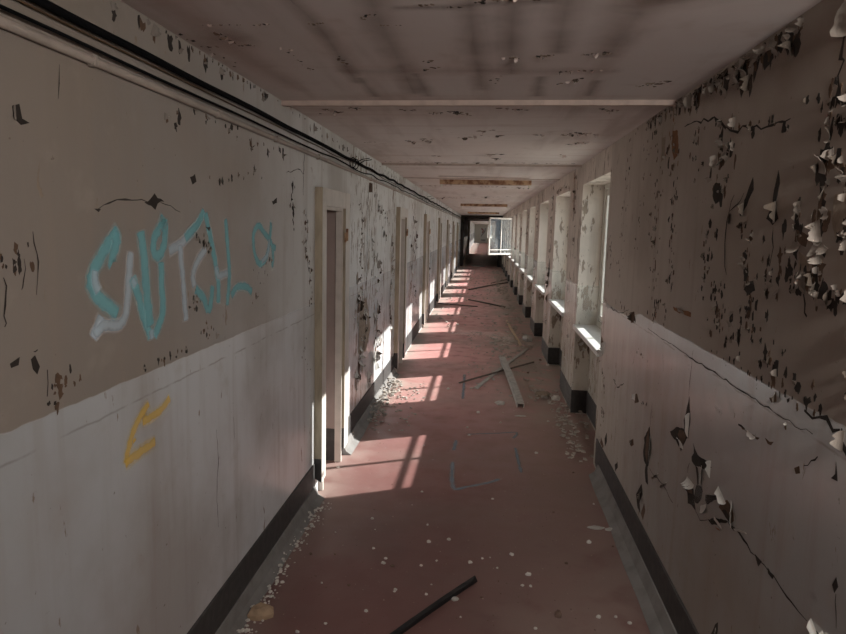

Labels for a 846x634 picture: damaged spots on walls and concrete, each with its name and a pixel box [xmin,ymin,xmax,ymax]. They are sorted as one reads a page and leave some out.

peeling [12,104,29,125]
peeling [643,17,804,289]
crack [685,113,791,139]
spalling [700,0,846,416]
peeling [0,234,39,327]
peeling [353,203,394,390]
crack [649,329,846,474]
spalling [636,422,673,519]
spalling [670,401,735,531]
crack [732,526,807,621]
crack [831,578,839,611]